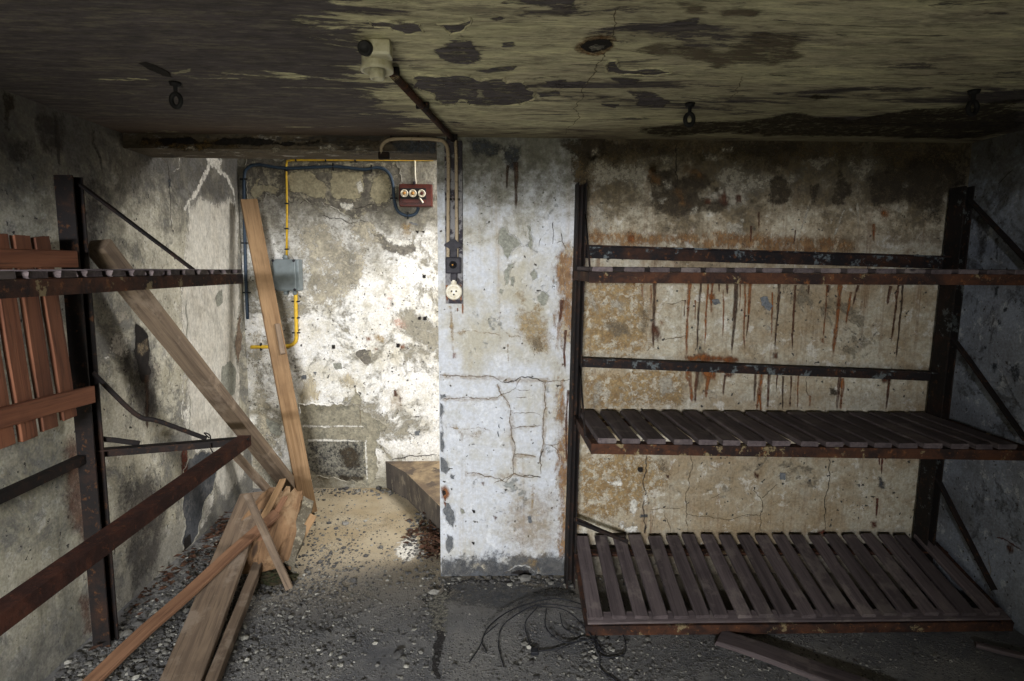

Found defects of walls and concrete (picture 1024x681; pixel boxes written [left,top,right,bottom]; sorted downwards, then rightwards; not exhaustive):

peeling [410,17,587,107]
efflorescence [184,158,235,217]
peeling [243,145,403,221]
leakage [561,99,1024,235]
peeling [373,230,425,256]
peeling [355,348,372,365]
corrosion [553,244,573,367]
corrosion [633,283,662,345]
corrosion [684,283,752,401]
spalling [298,387,388,487]
crack [443,375,569,482]
corrosion [555,380,580,556]